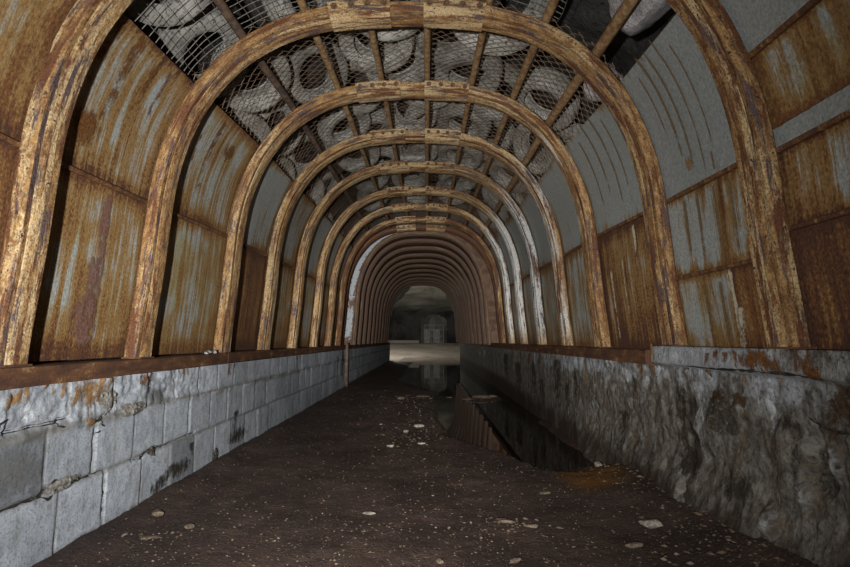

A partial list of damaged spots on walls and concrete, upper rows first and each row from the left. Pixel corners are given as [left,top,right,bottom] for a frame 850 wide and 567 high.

rust [97,22,126,60]
rust [75,36,148,145]
rust [636,41,715,170]
rust [682,201,692,253]
rust [69,195,113,346]
rust [705,282,783,384]
rust [4,387,29,410]
crack [0,413,65,435]
crack [0,464,104,513]
rust [44,378,112,427]
crack [132,432,193,460]
water stain [150,442,194,494]